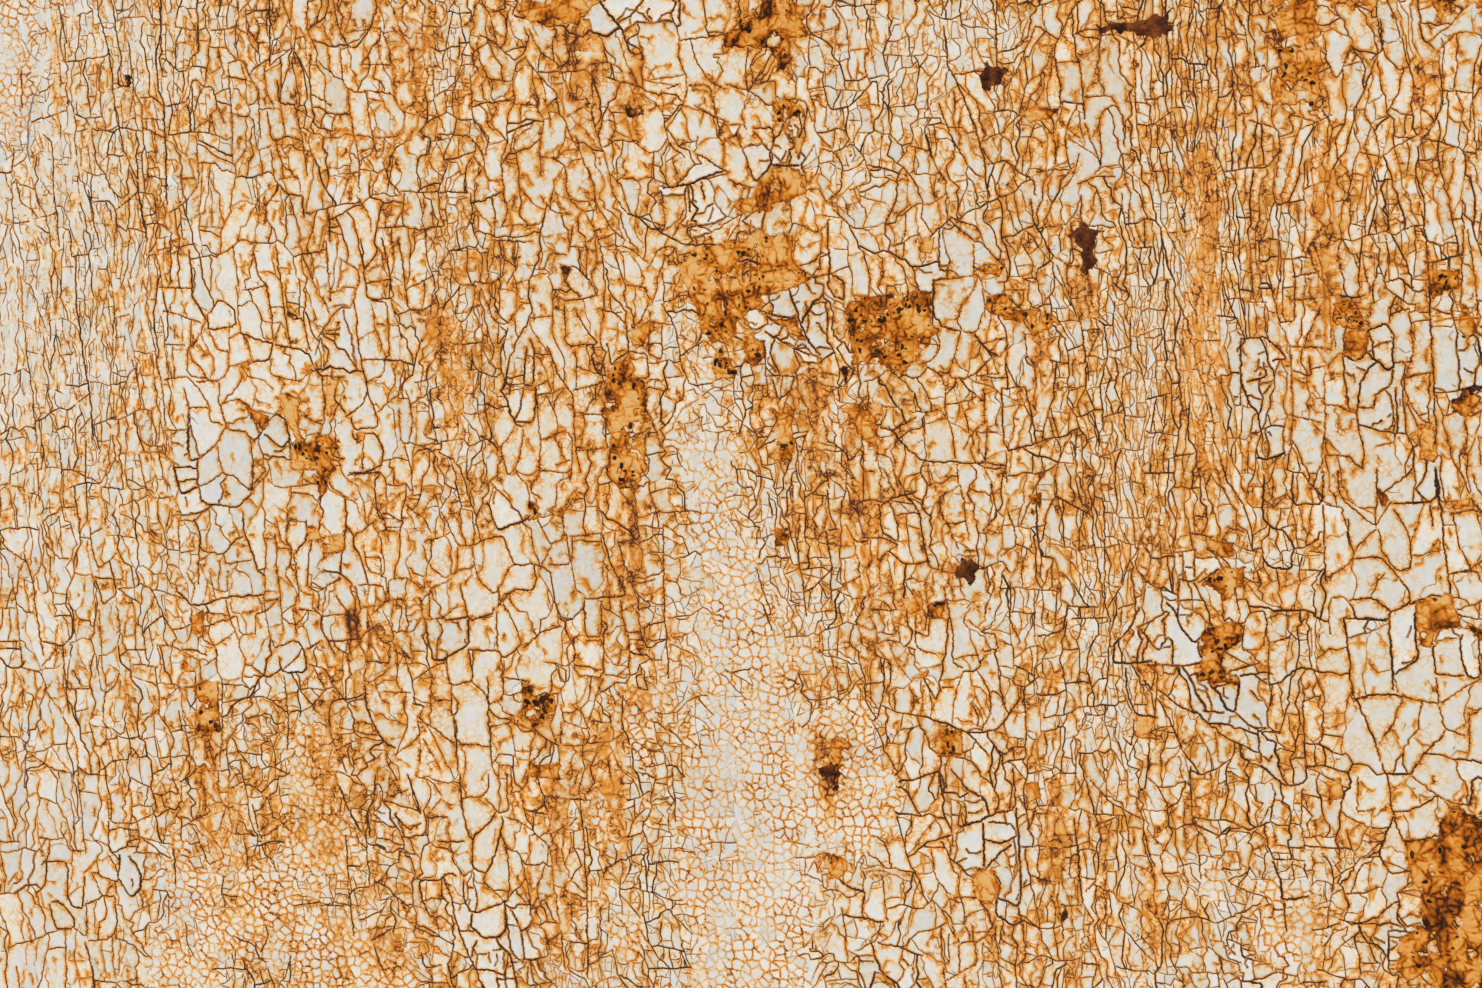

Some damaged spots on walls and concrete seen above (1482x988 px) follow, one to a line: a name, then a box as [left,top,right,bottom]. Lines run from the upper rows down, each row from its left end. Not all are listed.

peeling [583,0,679,48]
corrosion [724,0,808,71]
corrosion [1094,8,1174,38]
crack [1231,0,1482,169]
corrosion [246,394,338,493]
corrosion [679,97,938,666]
crack [795,0,1181,988]
corrosion [596,321,655,859]
peeling [1126,550,1285,783]
crack [1273,858,1308,931]
crack [1387,930,1408,988]
corrosion [1396,806,1482,988]